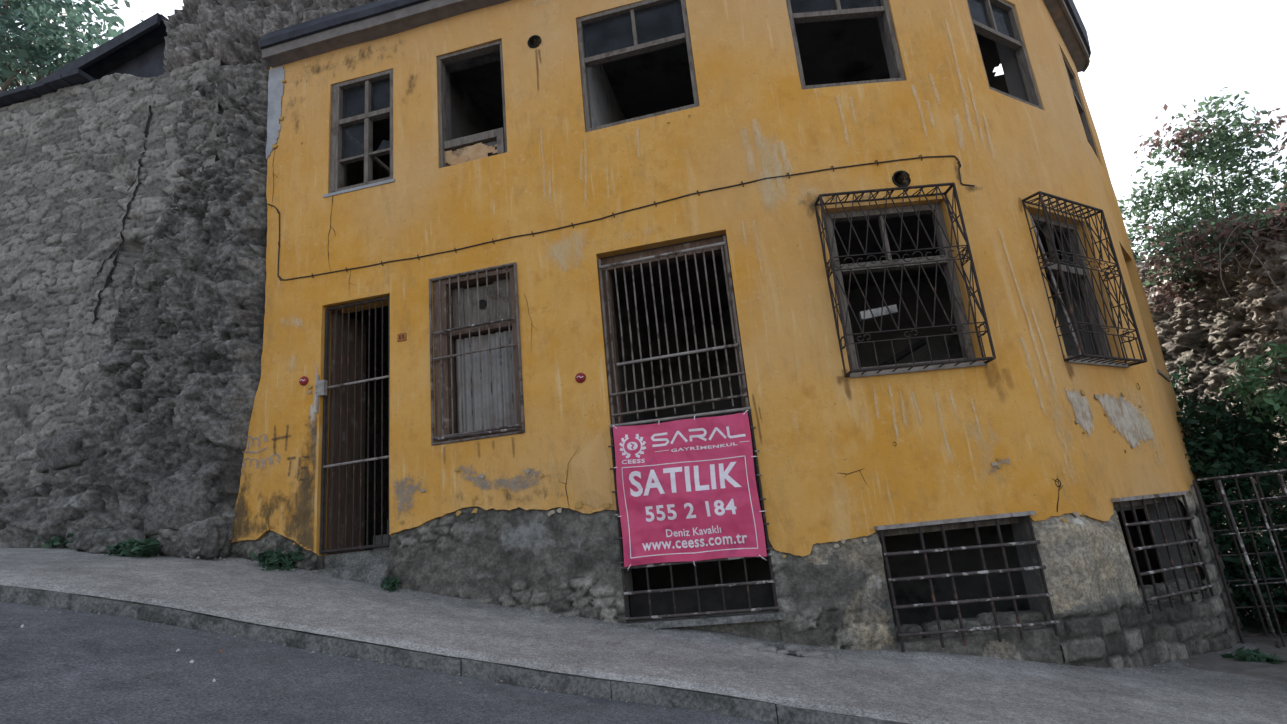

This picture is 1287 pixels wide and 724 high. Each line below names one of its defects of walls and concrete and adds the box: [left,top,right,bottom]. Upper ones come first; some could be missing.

crack [92,105,152,324]
peeling [1065,388,1154,448]
flaking render [389,466,627,623]